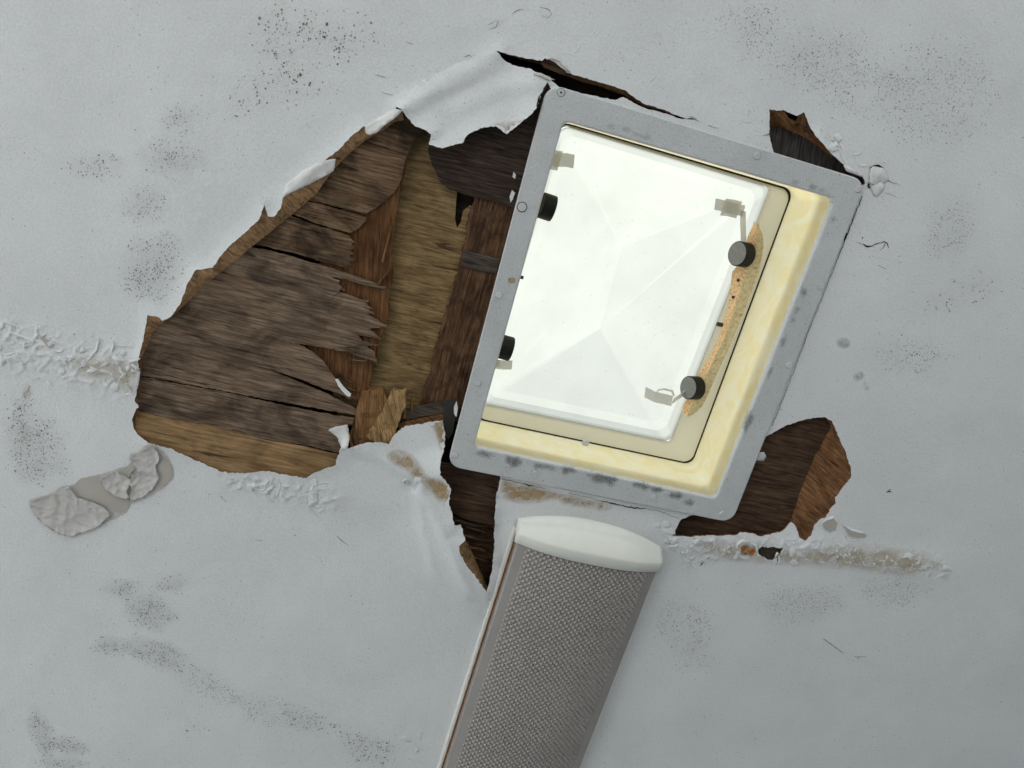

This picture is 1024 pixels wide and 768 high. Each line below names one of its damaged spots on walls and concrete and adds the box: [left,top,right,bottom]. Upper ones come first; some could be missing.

crack [772,165,897,425]
peeling [29,444,174,537]
corrosion [736,539,758,559]